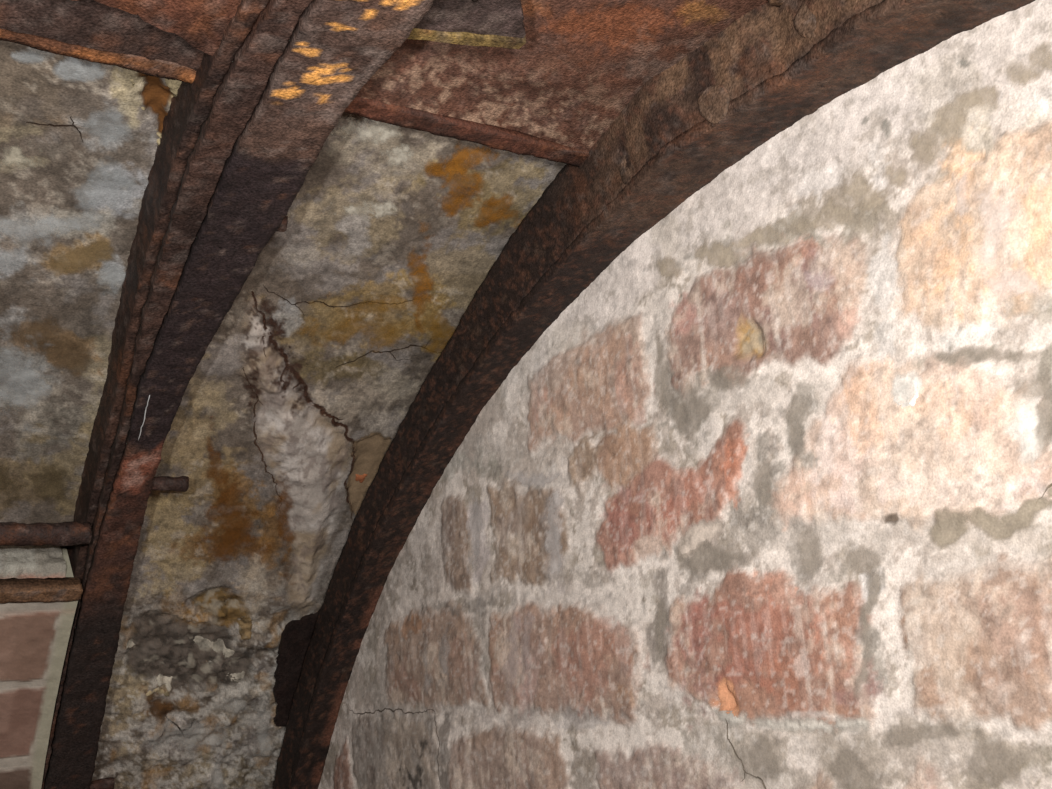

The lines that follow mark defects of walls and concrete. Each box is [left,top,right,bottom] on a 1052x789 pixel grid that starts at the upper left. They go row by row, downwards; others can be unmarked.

crack [27,117,83,141]
corrosion [426,145,490,216]
crack [335,339,441,368]
crack [240,285,416,520]
crack [726,721,766,789]